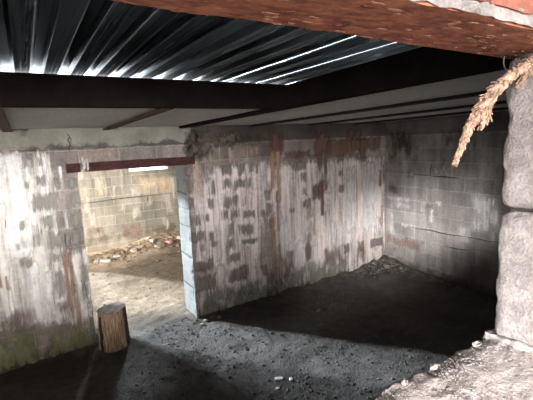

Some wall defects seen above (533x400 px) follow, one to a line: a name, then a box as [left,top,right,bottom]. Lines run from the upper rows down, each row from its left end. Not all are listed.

corrosion [269,129,380,285]
crack [412,227,496,250]
corrosion [63,251,81,329]